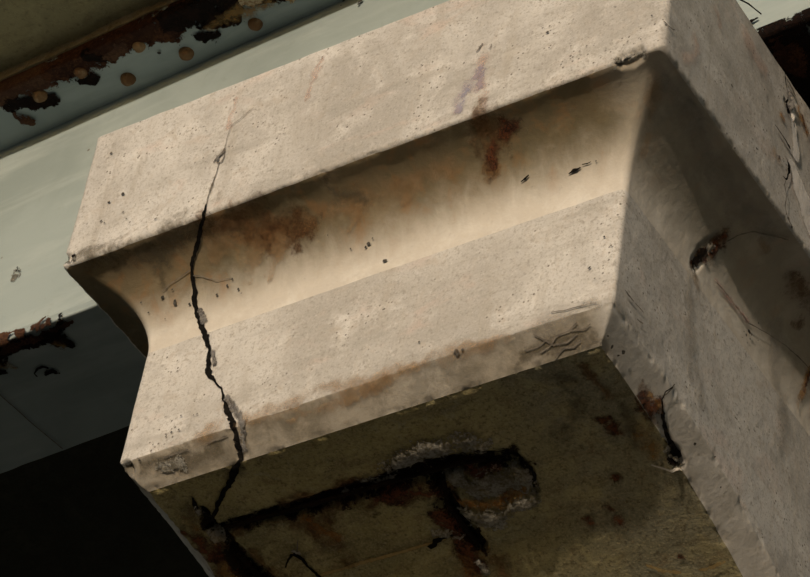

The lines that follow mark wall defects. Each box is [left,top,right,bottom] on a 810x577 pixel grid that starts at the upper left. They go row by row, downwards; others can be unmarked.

rust [0,0,295,126]
rust [471,100,520,179]
spalling [775,76,810,235]
rust [0,313,75,375]
crack [162,110,250,521]
crack [285,541,321,577]
spalling [192,431,542,577]